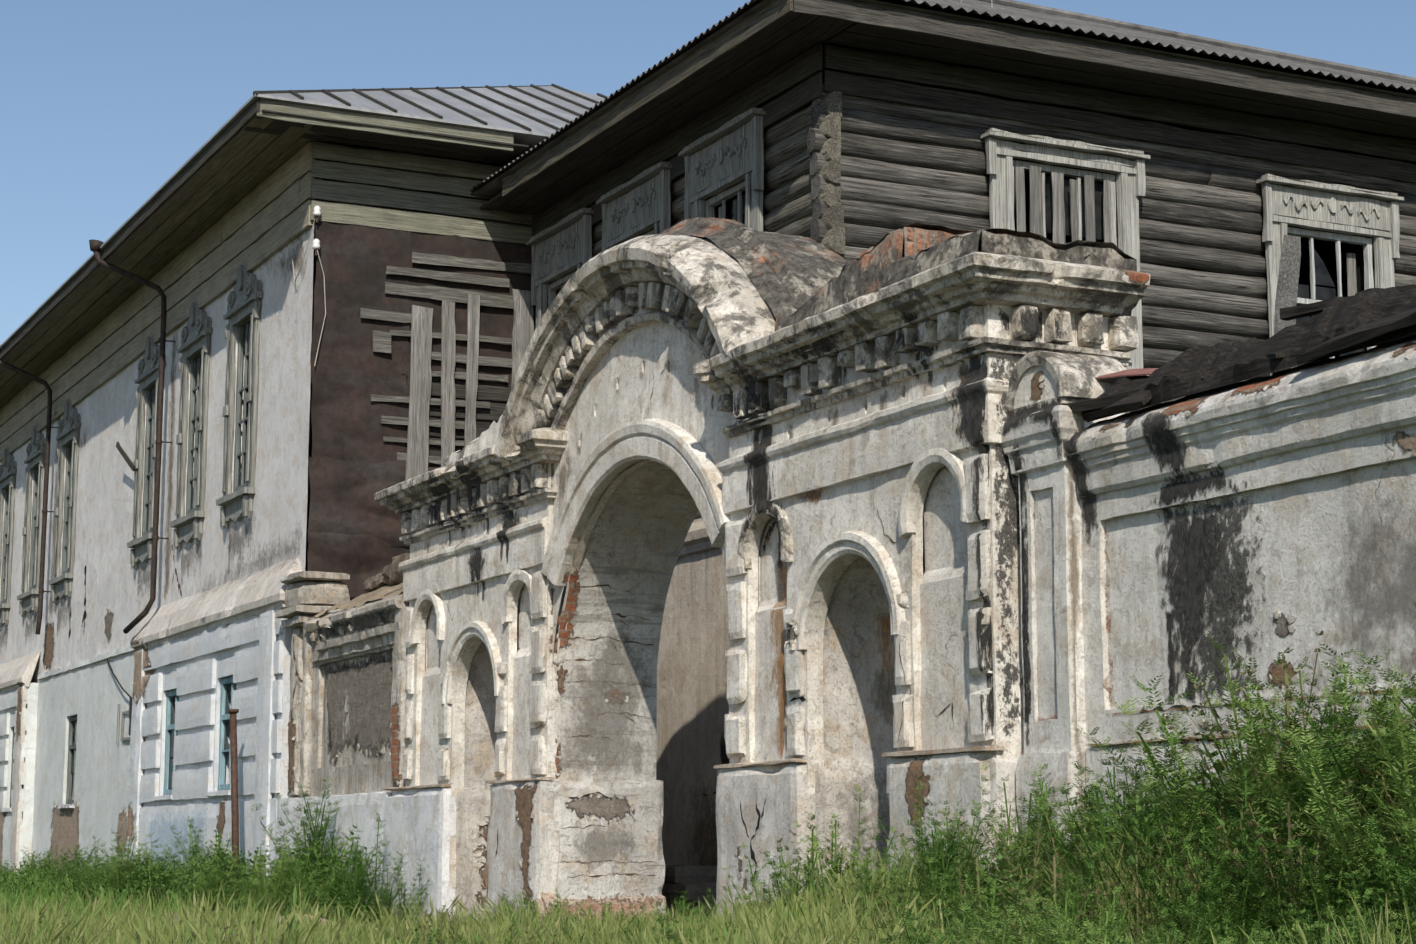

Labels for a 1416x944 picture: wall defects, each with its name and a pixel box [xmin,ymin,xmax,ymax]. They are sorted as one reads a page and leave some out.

spalling [547,568,580,701]
leakage [728,354,792,568]
leakage [945,300,1098,753]
leakage [1141,411,1266,715]
leakage [1347,522,1416,657]
peeling [1392,430,1416,455]
leakage [328,695,383,755]
peeling [0,807,8,869]
peeling [49,801,80,877]
peeling [116,802,140,859]
spalling [514,740,563,909]
crack [699,788,766,897]